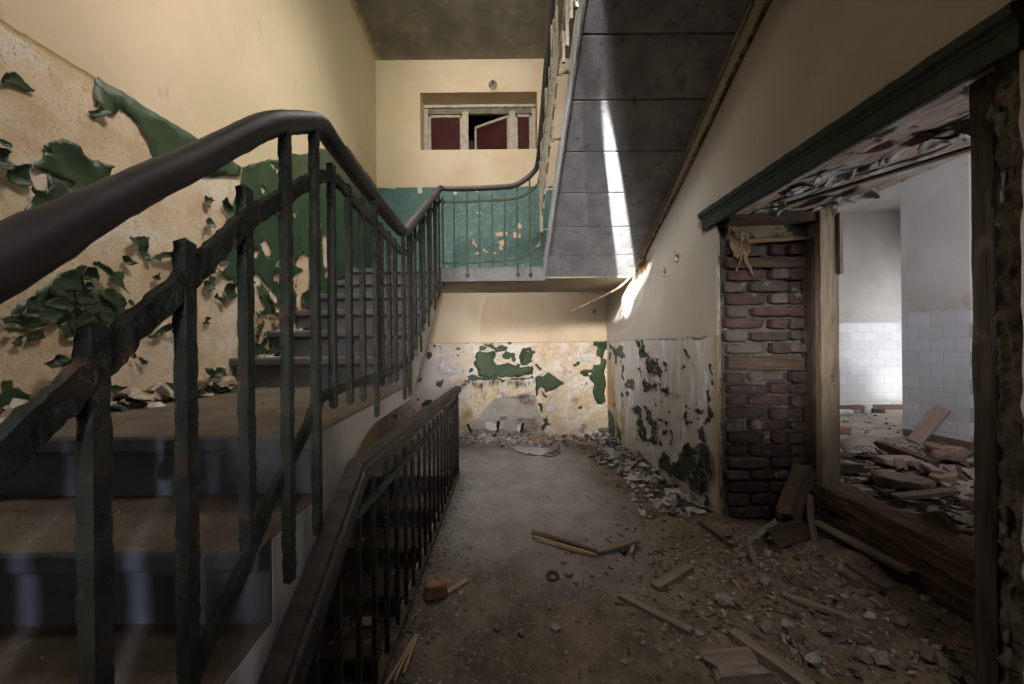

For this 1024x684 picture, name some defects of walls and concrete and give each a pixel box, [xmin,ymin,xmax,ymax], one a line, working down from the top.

peeling [0,71,35,92]
peeling [88,76,197,158]
peeling [0,138,115,210]
peeling [0,236,173,384]
peeling [203,248,237,306]
peeling [204,159,279,232]
peeling [253,214,280,354]
peeling [292,148,372,325]
peeling [753,132,971,217]
peeling [0,380,31,410]
peeling [204,367,228,380]
flaking render [456,223,807,522]